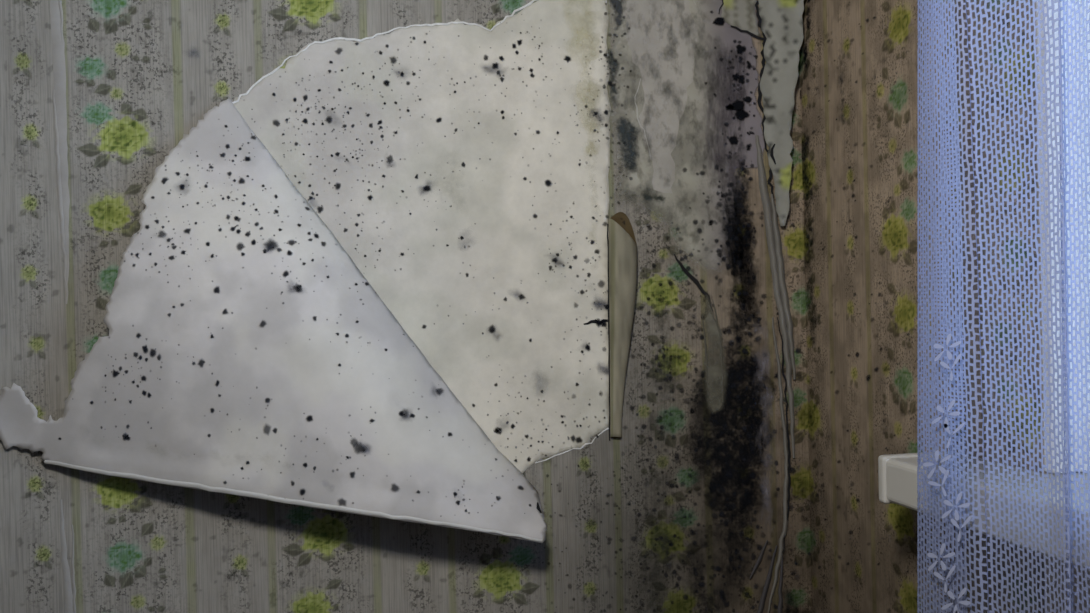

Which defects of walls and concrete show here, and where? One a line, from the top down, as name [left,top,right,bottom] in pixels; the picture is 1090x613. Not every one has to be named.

mould [105,333,161,403]
mould [145,220,197,260]
mould [219,109,326,256]
mould [274,89,397,267]
peeling [0,0,804,543]
damp [484,32,547,97]
mould [594,301,609,327]
damp [570,0,637,179]
damp [619,162,795,613]
mould [714,40,757,158]
crack [719,0,776,199]
crack [777,317,791,553]